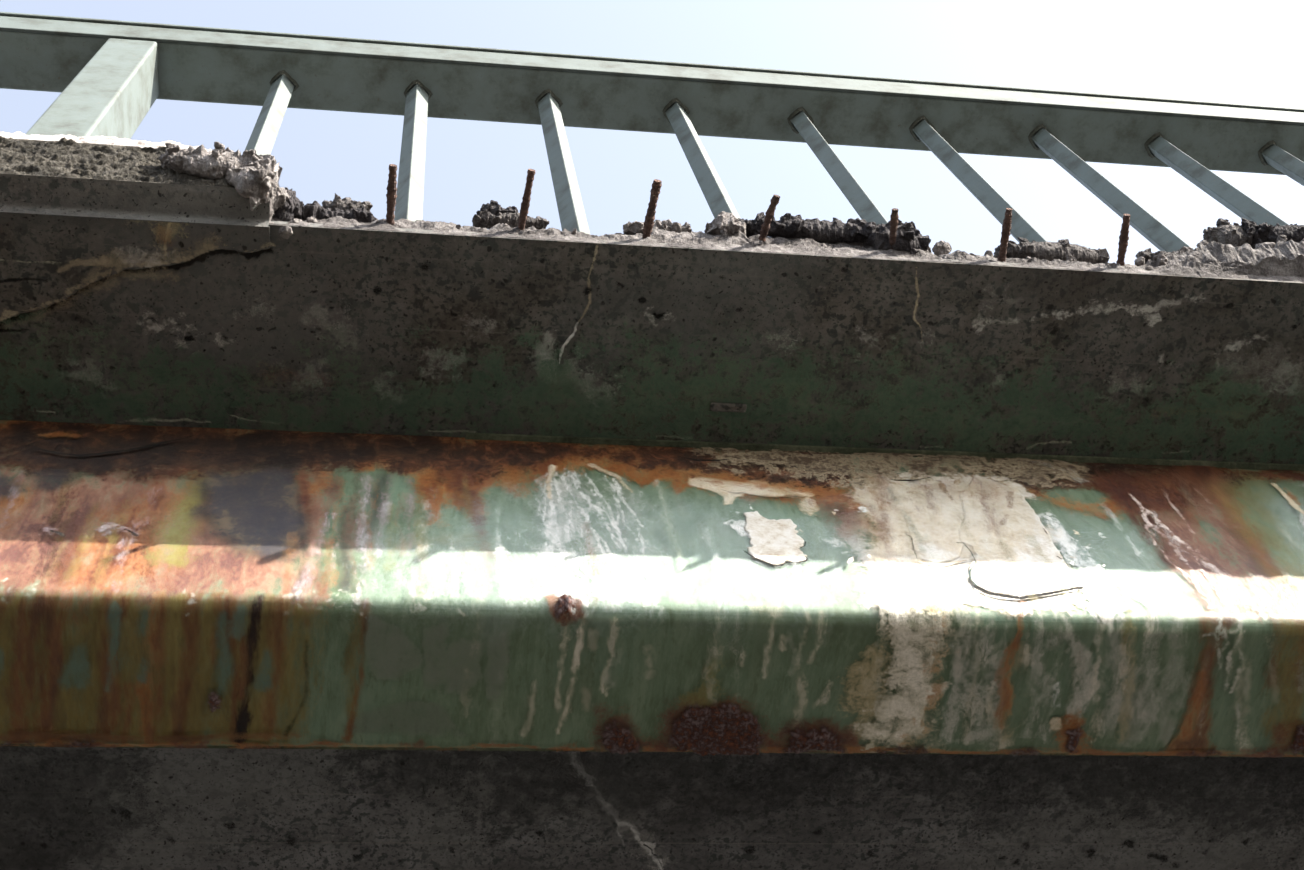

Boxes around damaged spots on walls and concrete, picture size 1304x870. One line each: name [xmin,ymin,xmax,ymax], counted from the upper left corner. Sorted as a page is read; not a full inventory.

crack [0,220,274,333]
crack [555,244,599,374]
spalling [269,164,1304,282]
corrosion [0,420,864,520]
peeling [584,461,1114,622]
corrosion [0,594,609,752]
leakage [0,462,1304,870]
corrosion [830,461,1304,758]
crack [548,751,671,870]